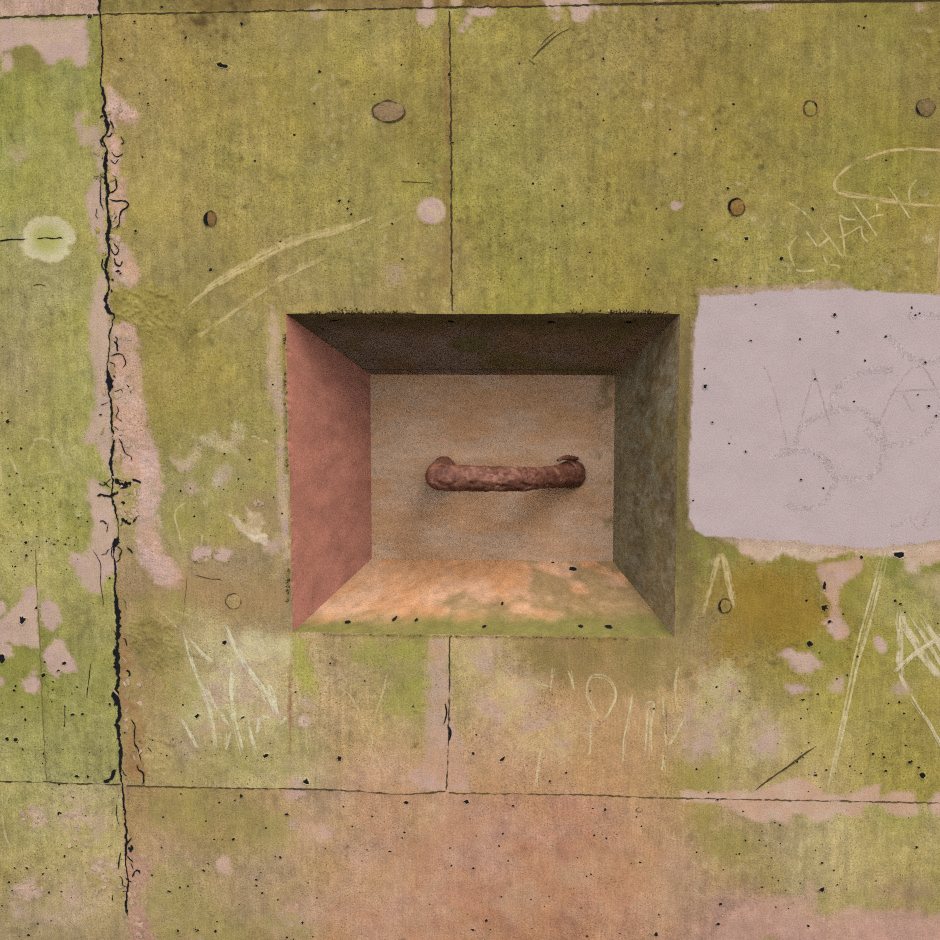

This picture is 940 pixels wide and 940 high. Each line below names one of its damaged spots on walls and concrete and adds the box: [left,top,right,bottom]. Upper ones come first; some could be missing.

peeling [0,12,95,81]
spalling [0,79,235,599]
crack [87,0,152,917]
peeling [0,582,80,697]
peeling [735,546,940,644]
peeling [0,629,159,940]
peeling [657,646,940,829]